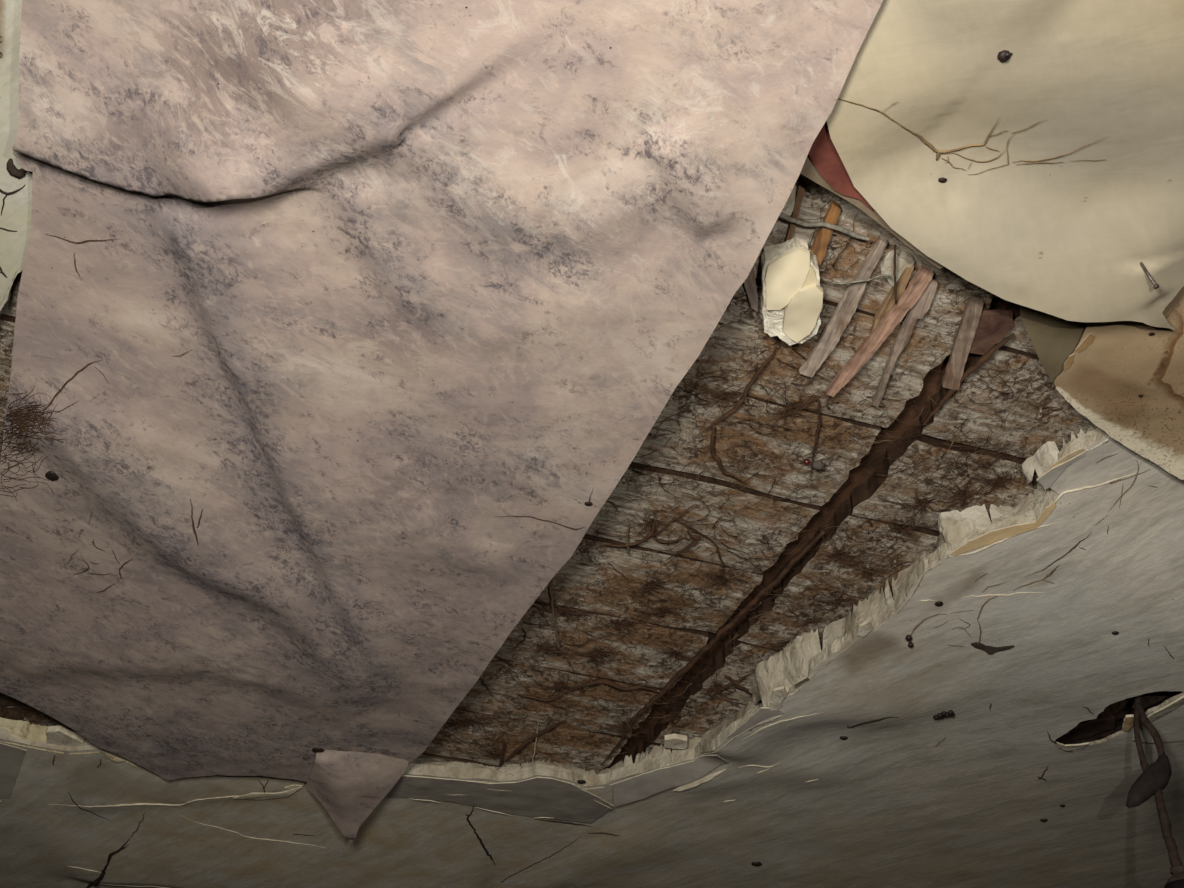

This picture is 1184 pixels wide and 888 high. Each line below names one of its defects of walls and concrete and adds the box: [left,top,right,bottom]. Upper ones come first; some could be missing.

leakage [1158,323,1184,400]
peeling [384,427,1109,823]
spalling [1055,691,1184,751]
crack [86,813,145,888]